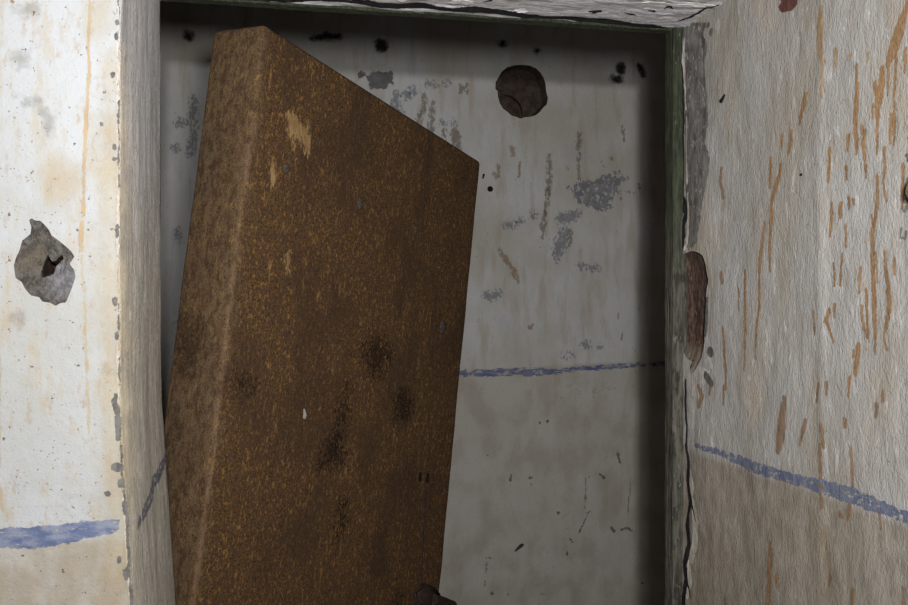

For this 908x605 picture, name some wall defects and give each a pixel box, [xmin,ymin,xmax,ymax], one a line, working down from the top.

flaking render [630,0,716,11]
spalling [14,219,75,306]
peeling [566,157,642,212]
rust [738,92,807,372]
rust [829,195,855,287]
rust [846,0,908,397]
rust [710,326,727,406]
rust [813,303,836,343]
rust [776,396,786,454]
crack [681,379,696,605]